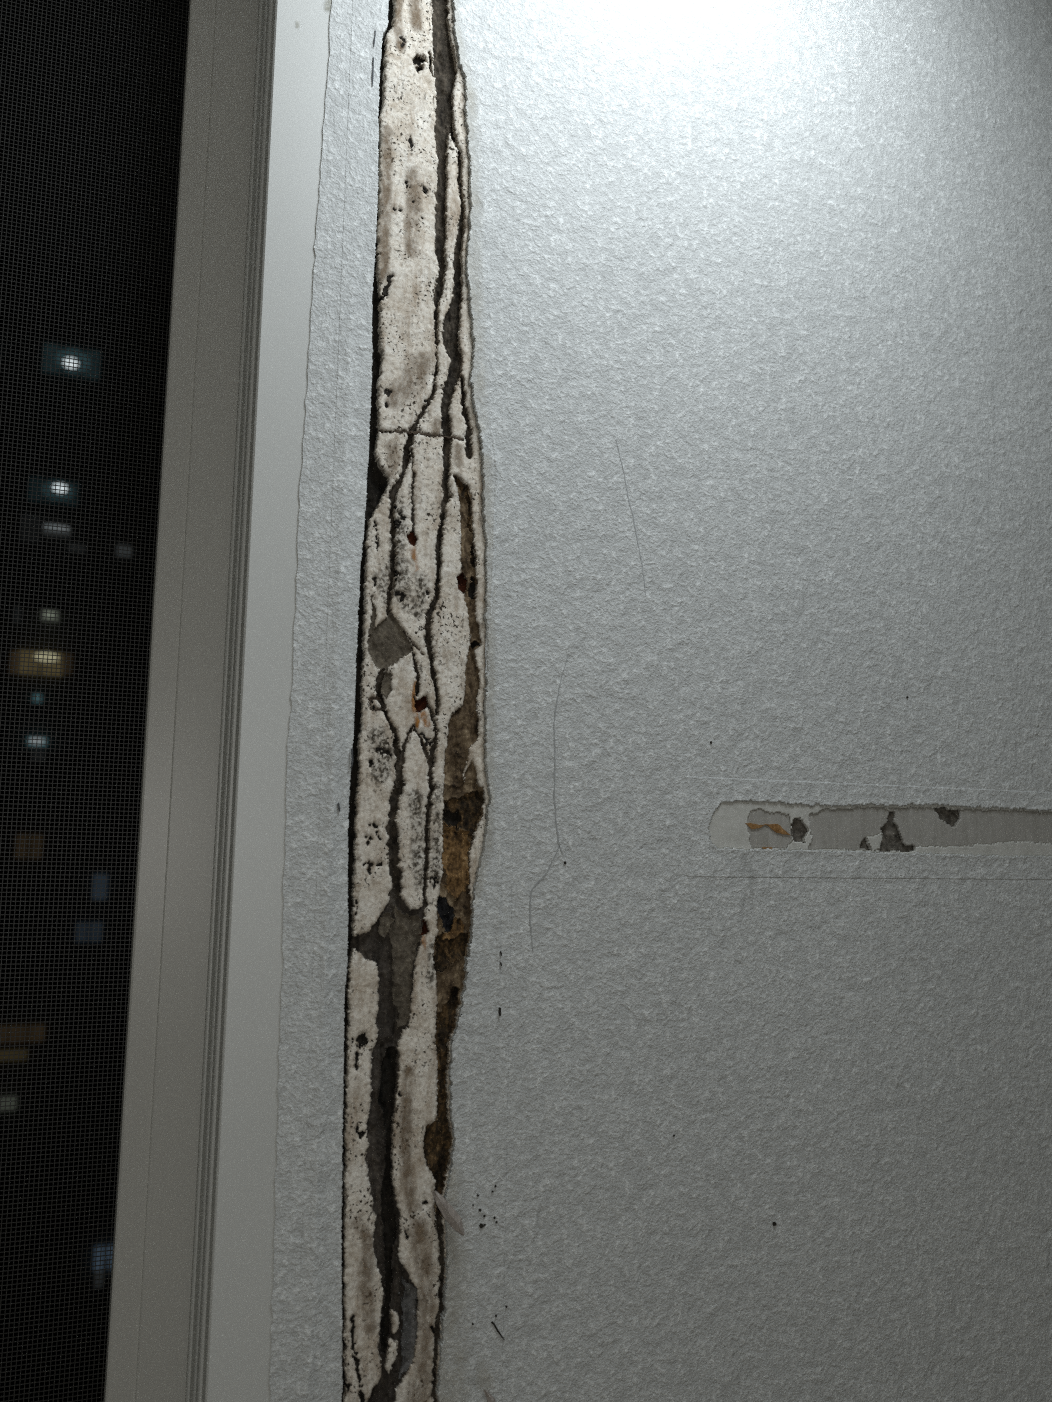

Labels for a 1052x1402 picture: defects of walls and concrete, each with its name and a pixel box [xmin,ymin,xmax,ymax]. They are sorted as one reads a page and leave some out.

damp [394,0,422,50]
damp [380,132,392,281]
damp [407,170,418,255]
damp [378,495,426,616]
peeling [342,0,489,1402]
damp [371,730,392,782]
damp [409,784,441,886]
spalling [791,818,807,842]
spalling [860,812,913,852]
spalling [935,807,959,827]
damp [401,1095,433,1402]